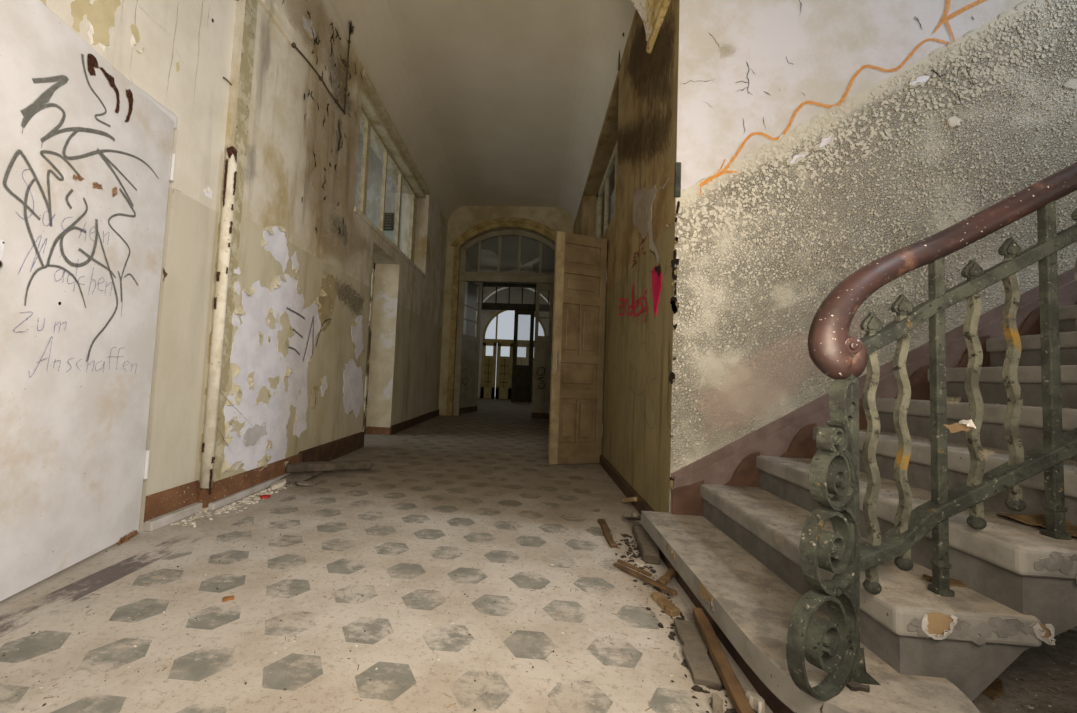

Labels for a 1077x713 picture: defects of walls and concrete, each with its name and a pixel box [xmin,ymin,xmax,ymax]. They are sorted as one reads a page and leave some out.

peeling [70,0,121,52]
peeling [130,24,145,54]
crack [683,62,805,132]
crack [931,67,974,105]
peeling [666,0,1077,463]
peeling [221,225,337,474]
peeling [343,315,365,418]